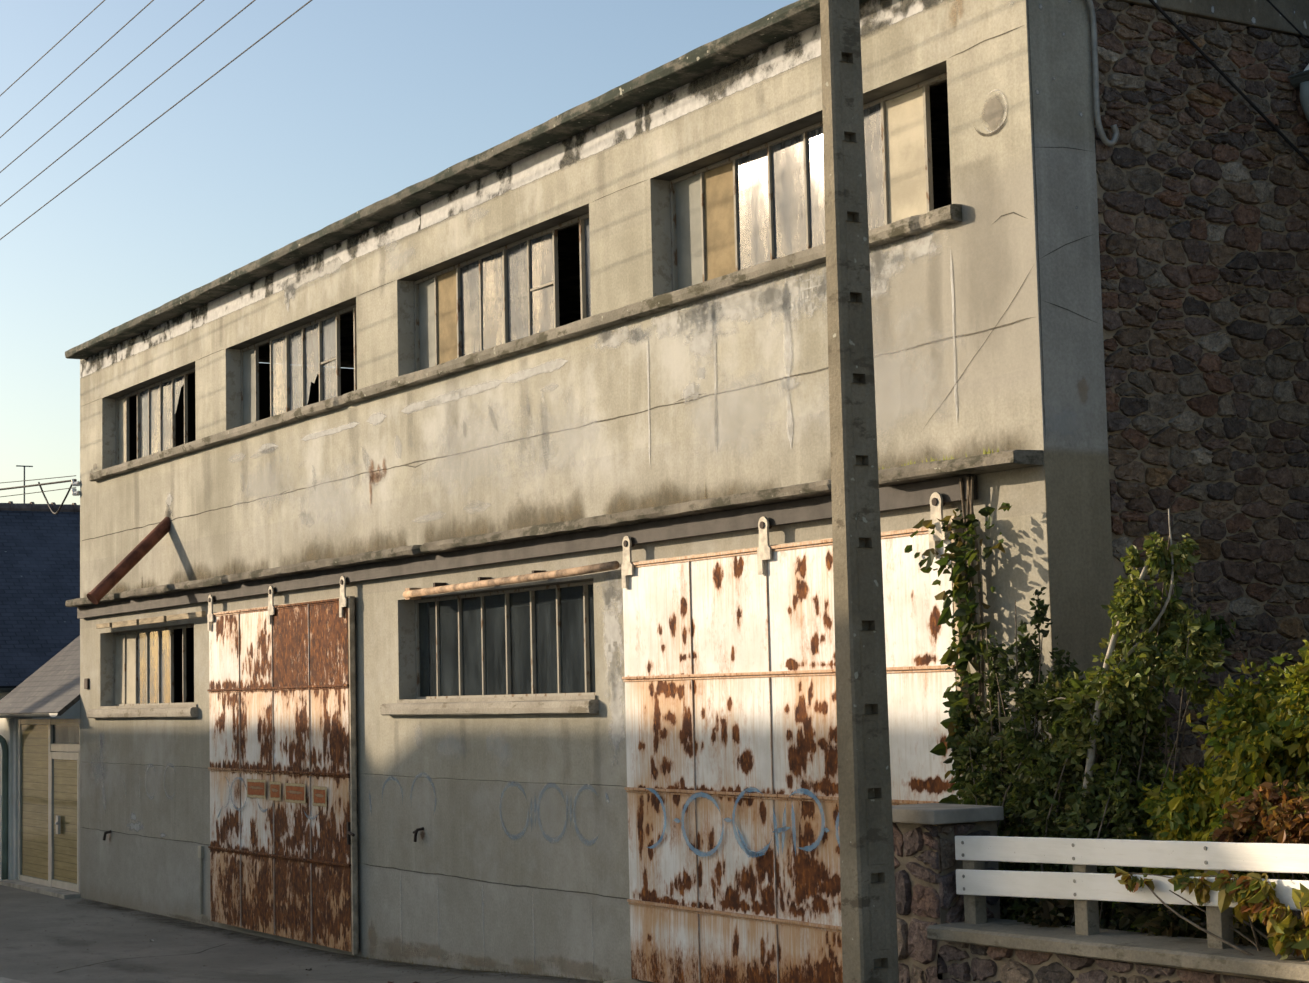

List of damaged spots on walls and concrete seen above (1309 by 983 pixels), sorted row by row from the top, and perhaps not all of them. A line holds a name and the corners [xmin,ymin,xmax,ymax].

peeling [860,0,924,34]
damp [859,0,940,36]
damp [614,33,816,143]
damp [559,125,597,168]
peeling [80,23,821,378]
damp [447,165,512,215]
rust [369,461,386,499]